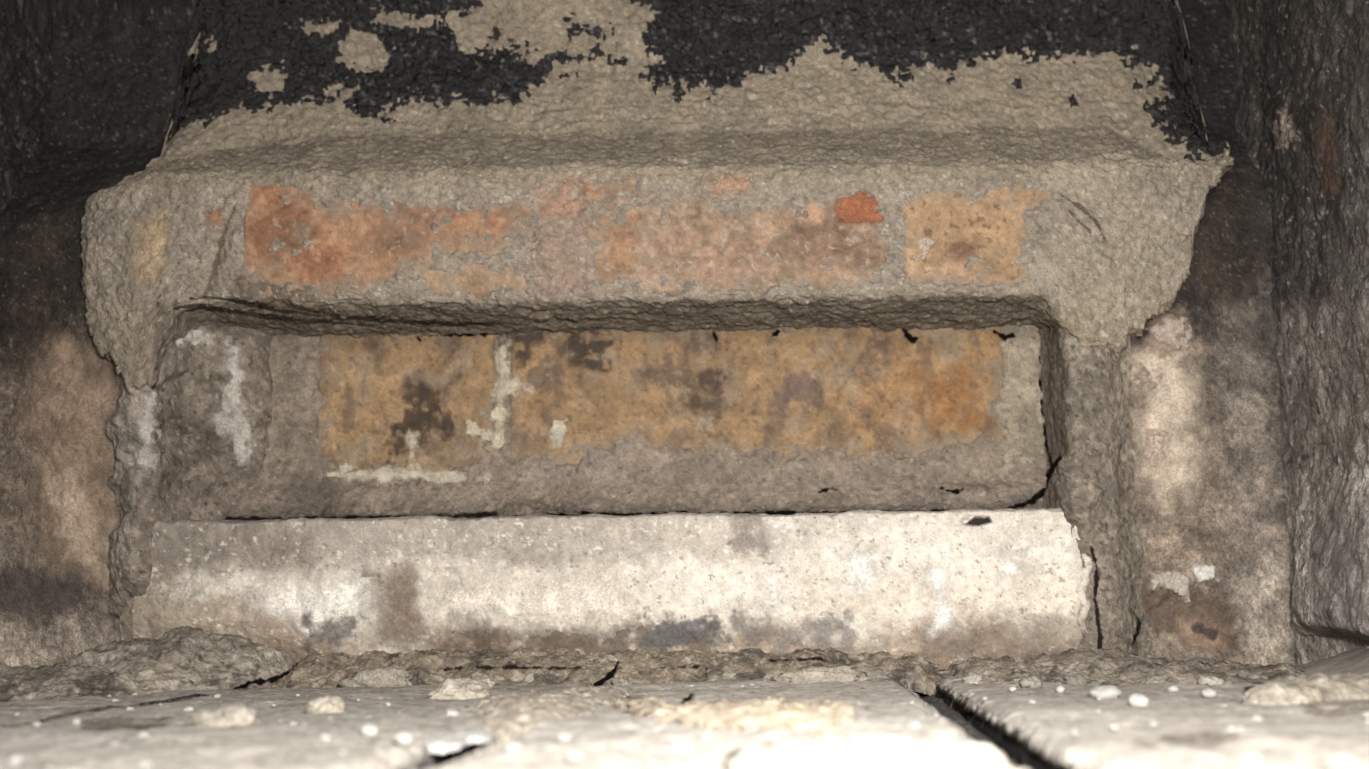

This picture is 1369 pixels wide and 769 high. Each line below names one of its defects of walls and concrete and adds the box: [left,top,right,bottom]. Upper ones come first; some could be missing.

damp [466,339,533,449]
damp [550,419,567,448]
crack [1090,547,1142,649]
crack [0,665,297,727]